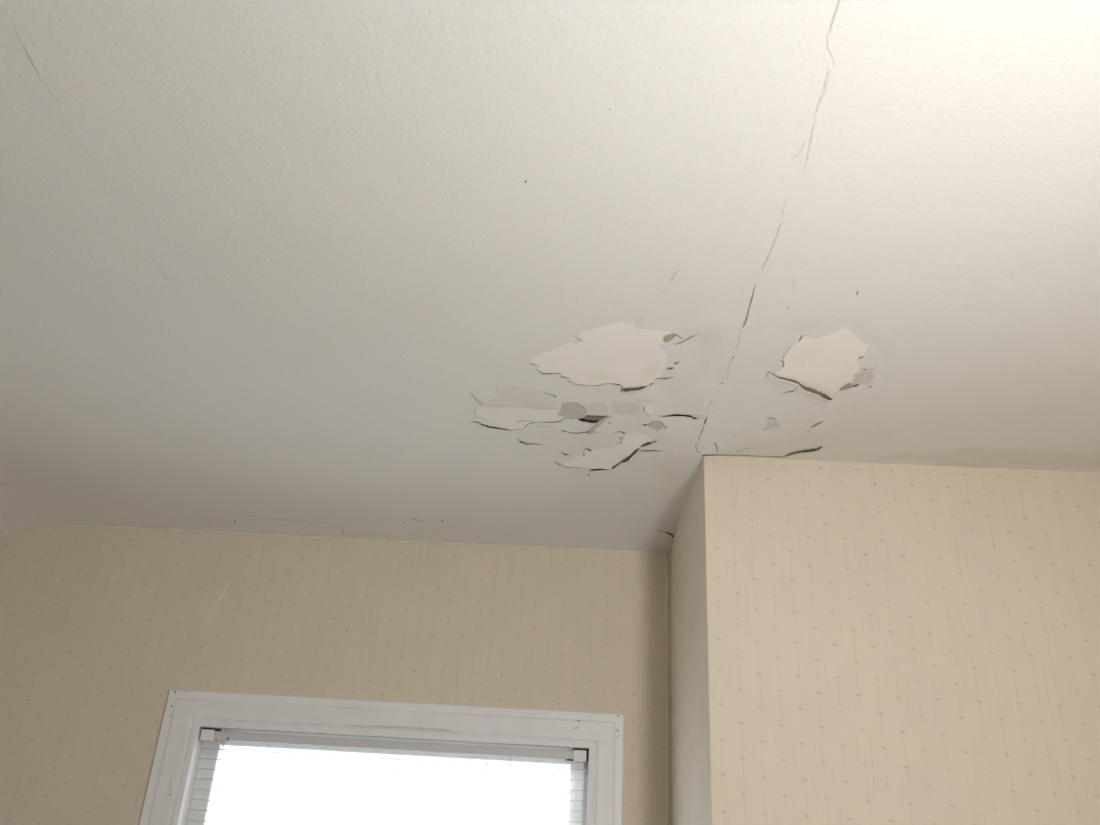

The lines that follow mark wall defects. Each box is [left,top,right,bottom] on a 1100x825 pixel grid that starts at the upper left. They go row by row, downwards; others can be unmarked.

crack [794,0,841,170]
peeling [530,316,698,395]
crack [658,196,825,459]
peeling [764,328,876,408]
peeling [469,385,668,475]